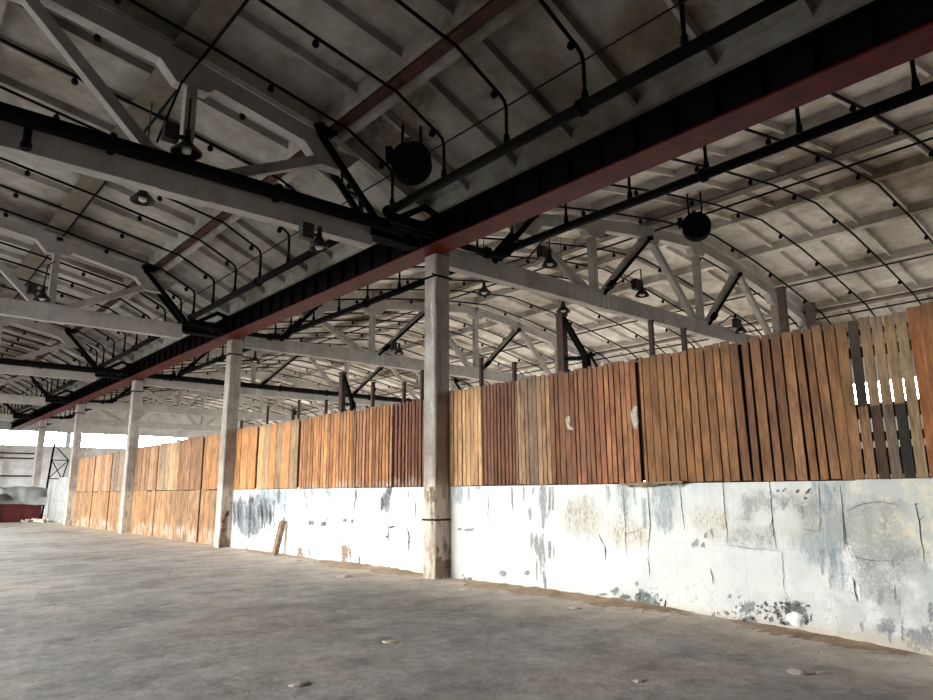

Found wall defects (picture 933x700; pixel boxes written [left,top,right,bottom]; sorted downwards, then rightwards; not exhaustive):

leakage [232,489,289,540]
leakage [606,484,673,529]
crack [806,485,924,600]
peeling [600,582,663,606]
spalling [713,594,812,625]
leakage [781,487,933,651]